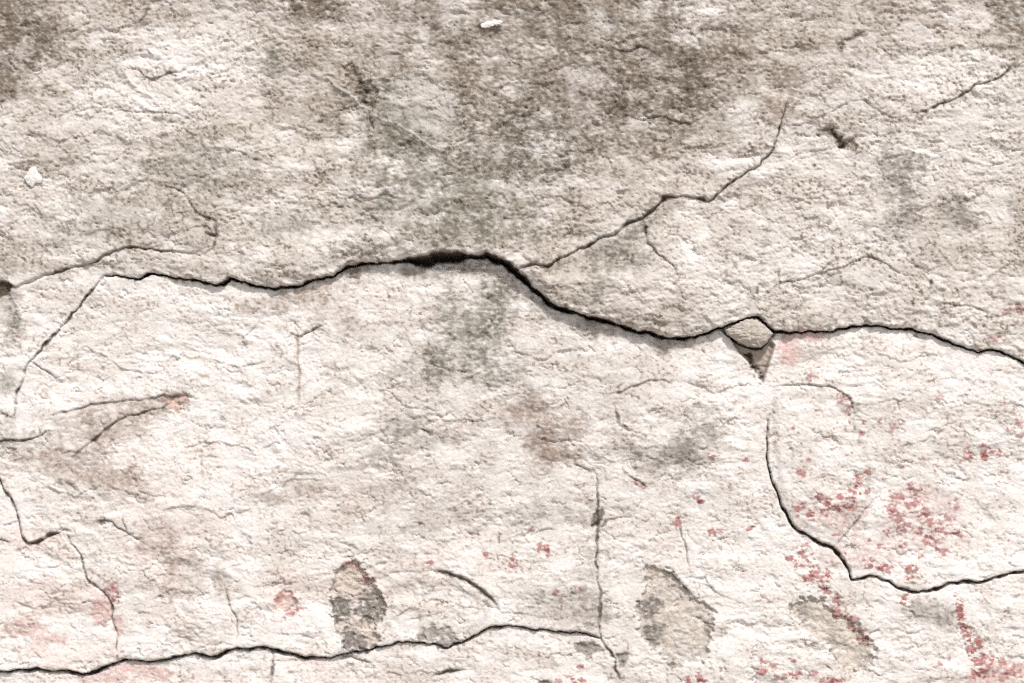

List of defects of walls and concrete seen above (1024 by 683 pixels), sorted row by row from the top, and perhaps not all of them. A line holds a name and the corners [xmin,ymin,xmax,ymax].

crack [171,187,218,237]
leakage [367,85,560,246]
crack [625,181,734,251]
leakage [901,153,924,217]
crack [42,246,1023,364]
spalling [733,342,773,379]
crack [79,406,165,452]
crack [4,533,57,545]
crack [593,479,601,569]
crack [766,424,1023,593]
crack [441,571,493,600]
crack [1,606,620,676]